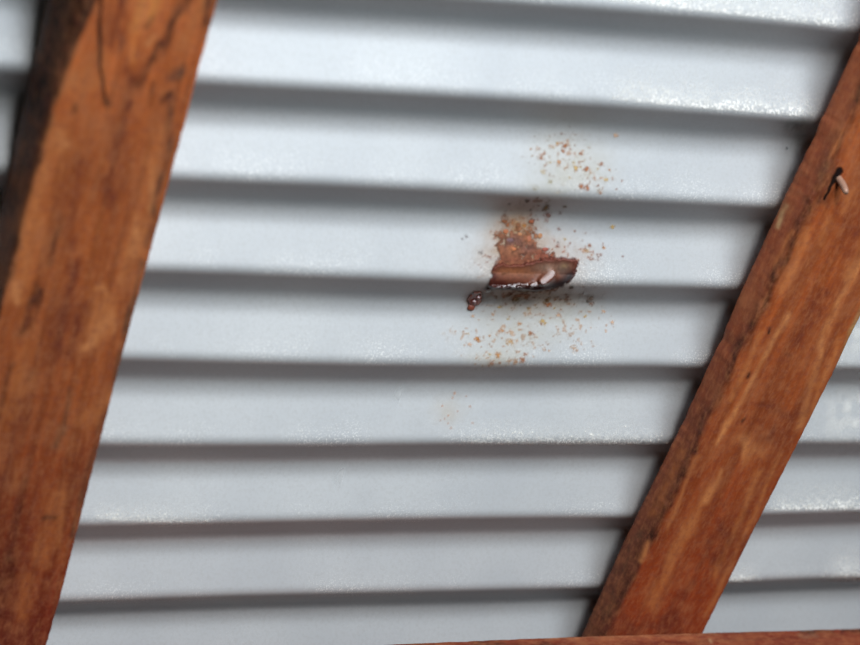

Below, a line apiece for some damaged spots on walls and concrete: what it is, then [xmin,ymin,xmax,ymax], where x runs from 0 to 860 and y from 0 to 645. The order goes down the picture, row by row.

rust [467,218,579,311]